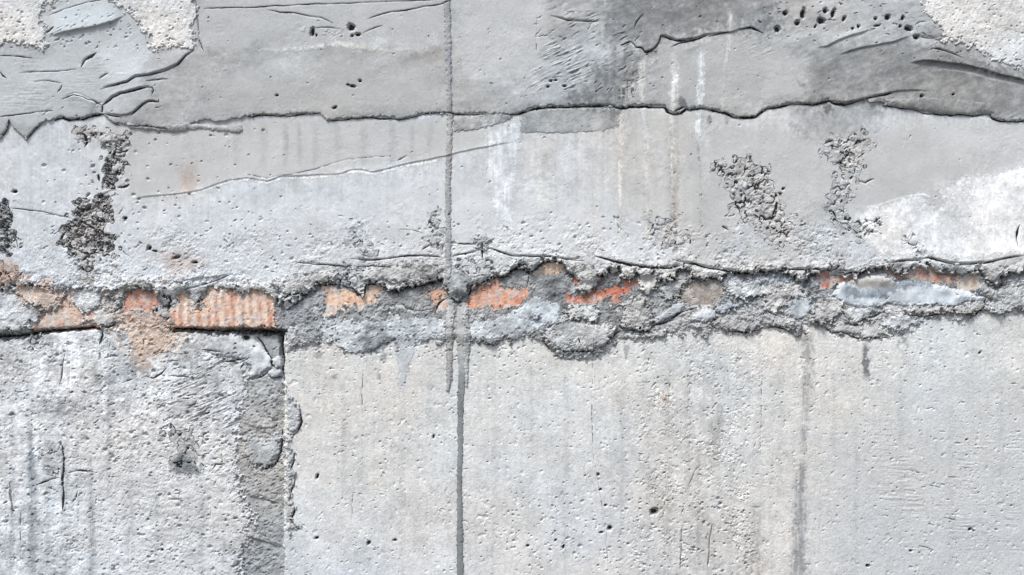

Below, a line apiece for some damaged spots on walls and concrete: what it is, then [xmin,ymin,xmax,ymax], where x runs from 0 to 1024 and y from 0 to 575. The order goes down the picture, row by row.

peeling [0,0,62,52]
peeling [108,0,201,52]
peeling [920,0,1024,70]
crack [0,0,484,281]
crack [510,93,1024,123]
spalling [56,125,136,292]
spalling [710,153,803,250]
spalling [819,128,878,244]
spalling [330,219,378,291]
spalling [456,257,502,283]
spalling [828,254,850,276]
spalling [152,287,179,331]